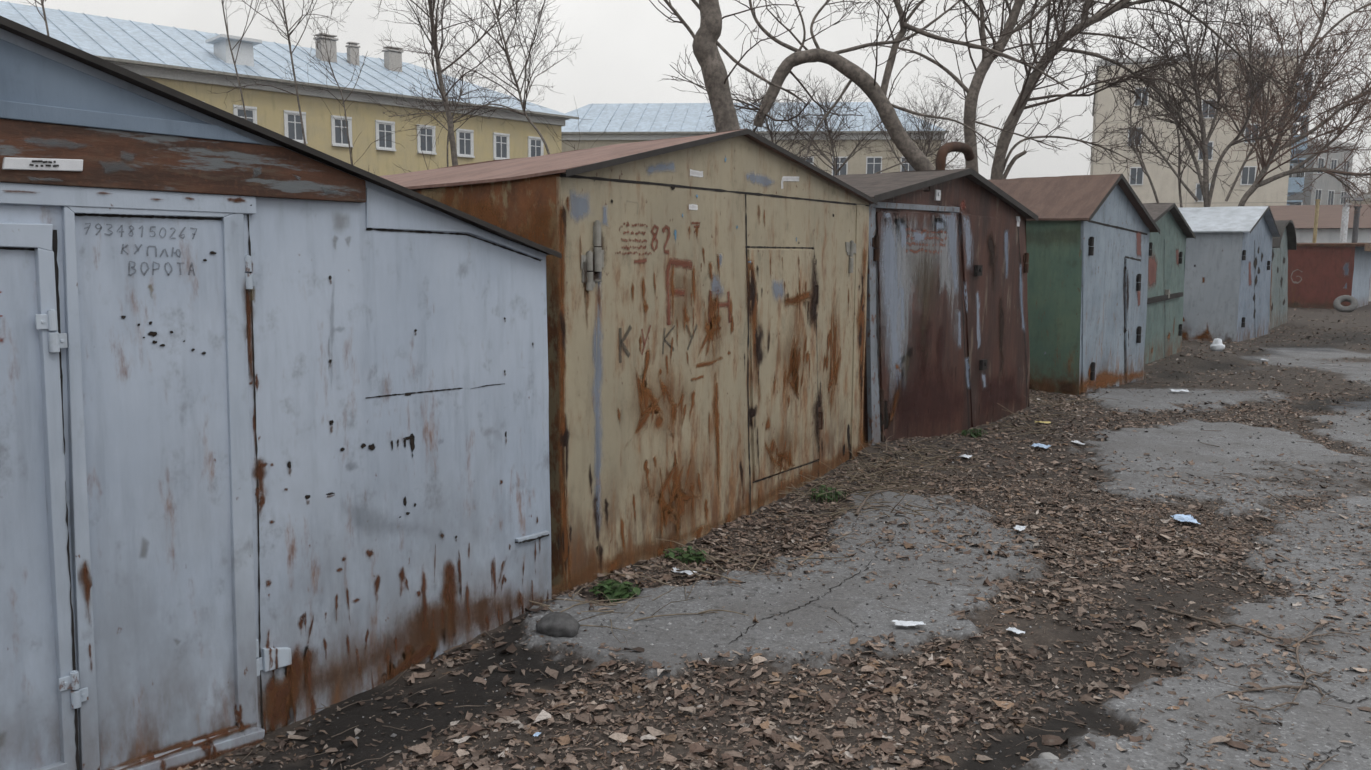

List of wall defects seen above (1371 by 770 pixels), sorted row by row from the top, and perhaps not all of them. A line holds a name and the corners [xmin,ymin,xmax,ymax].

rust [79,563,92,600]
rust [118,197,711,770]
rust [632,226,871,522]
rust [979,299,1142,424]